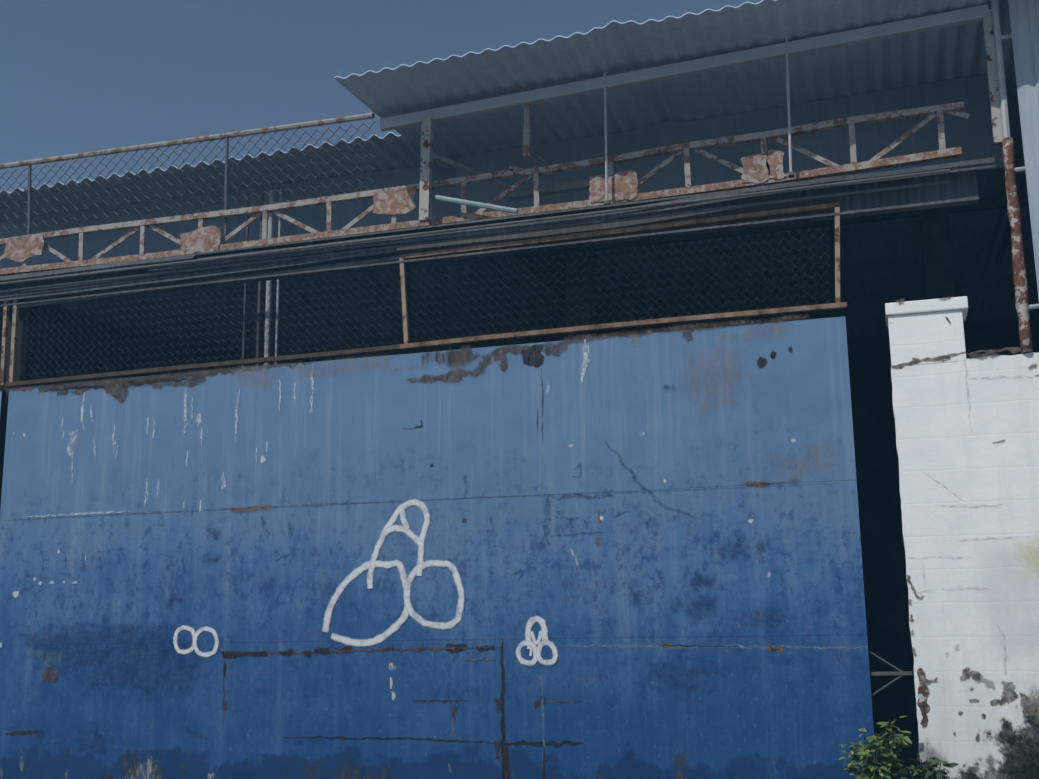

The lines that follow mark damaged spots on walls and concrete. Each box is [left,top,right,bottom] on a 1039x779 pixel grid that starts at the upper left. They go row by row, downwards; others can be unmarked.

crack [891,352,966,369]
rust [462,639,510,779]
water stain [954,690,1039,779]
peeling [960,668,1039,724]